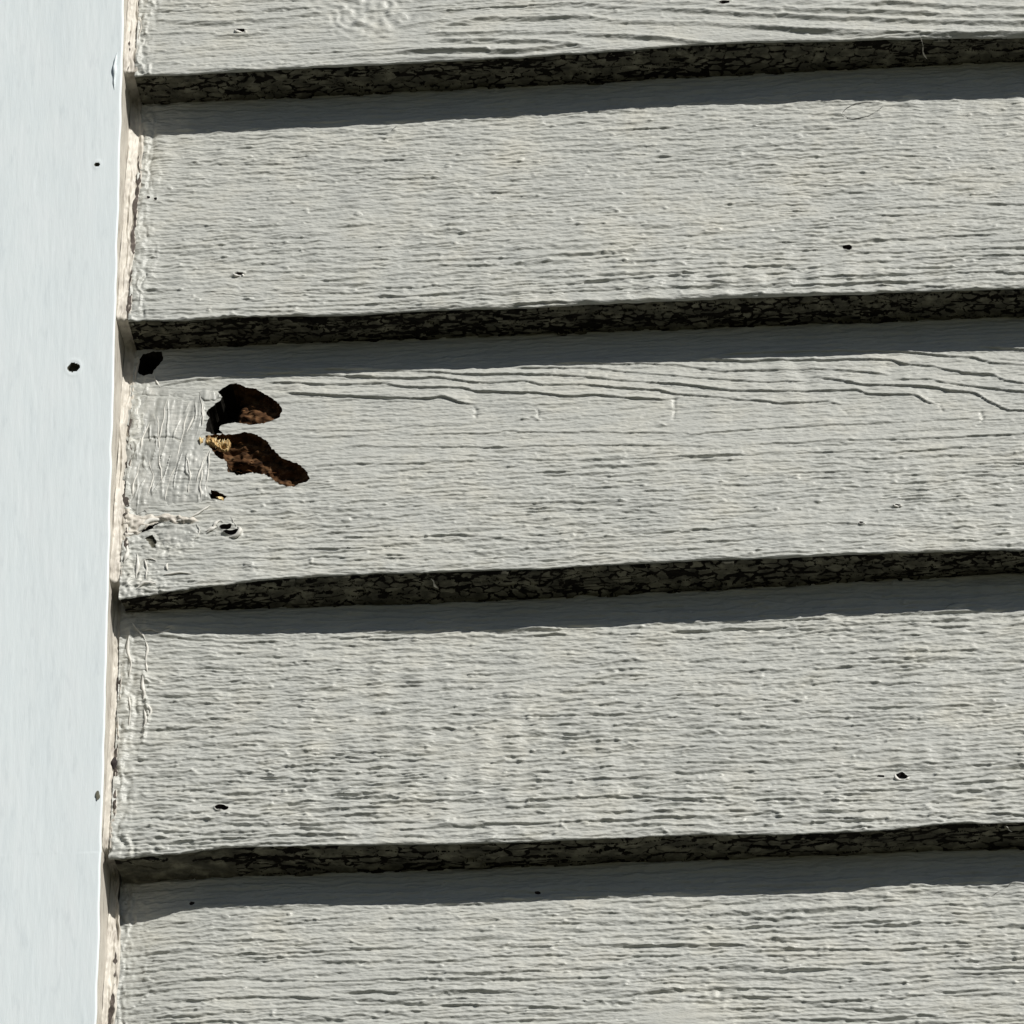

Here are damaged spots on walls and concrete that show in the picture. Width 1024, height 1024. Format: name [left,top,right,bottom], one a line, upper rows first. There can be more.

spalling [205,383,310,487]
peeling [121,505,242,588]